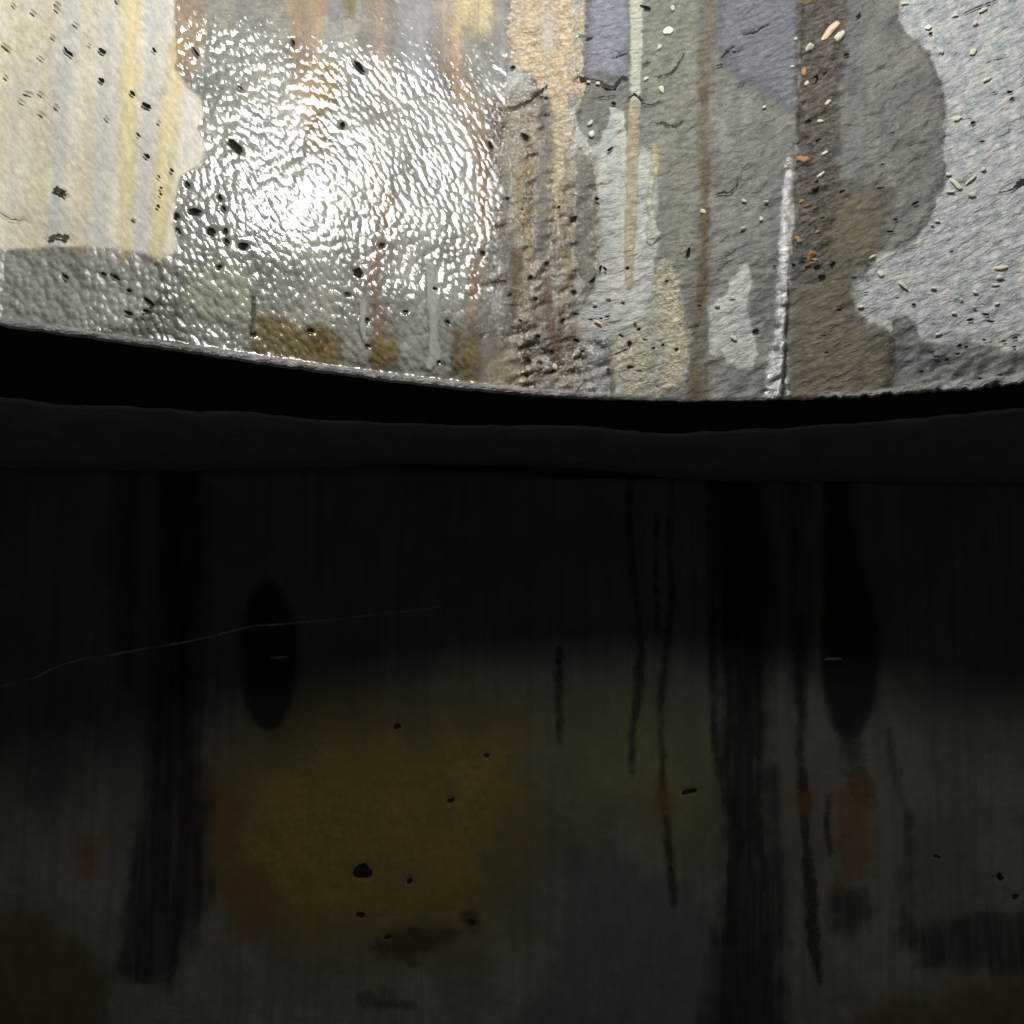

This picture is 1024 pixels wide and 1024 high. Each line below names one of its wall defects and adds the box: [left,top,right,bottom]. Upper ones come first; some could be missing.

damp [711,0,800,110]
damp [850,0,1024,343]
damp [122,469,205,982]
crack [0,606,440,687]
damp [707,480,783,1024]